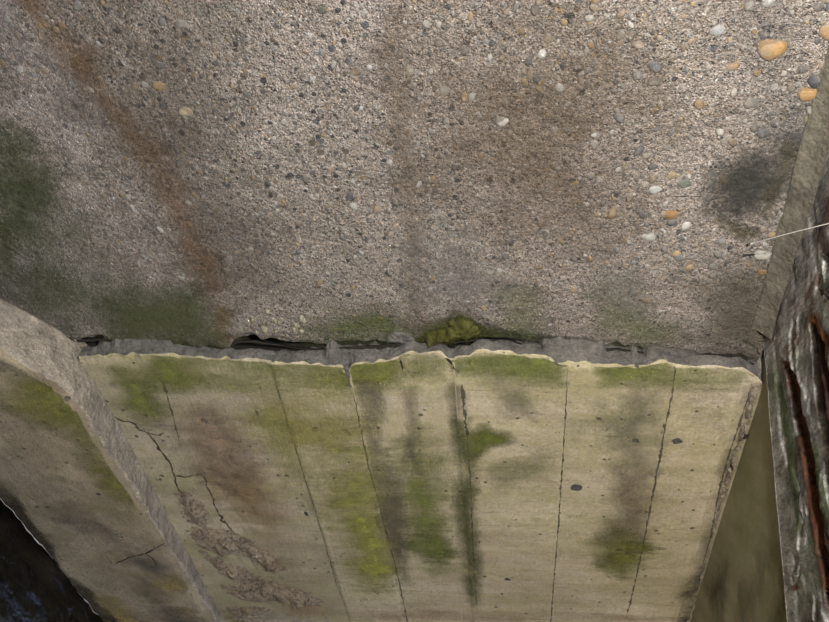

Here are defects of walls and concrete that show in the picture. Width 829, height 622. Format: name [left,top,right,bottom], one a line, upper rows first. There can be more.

water stain [712,143,787,218]
crack [65,335,410,388]
crack [114,543,164,565]
crack [115,417,241,537]
water stain [380,451,452,559]
crack [445,332,828,619]
rust [782,360,829,609]